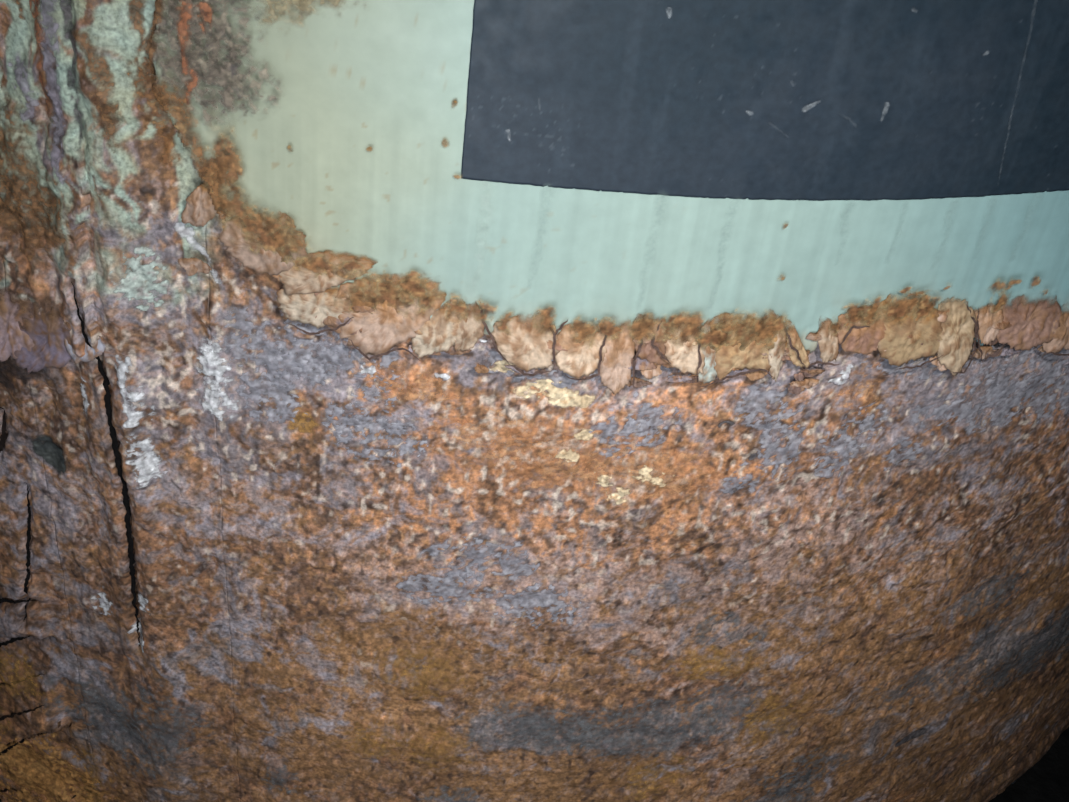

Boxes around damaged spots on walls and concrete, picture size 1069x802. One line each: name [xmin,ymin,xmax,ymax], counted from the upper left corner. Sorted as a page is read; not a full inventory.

rust [0,0,119,267]
rust [127,0,431,315]
rust [446,293,512,334]
rust [535,307,556,333]
peeling [177,185,1069,408]
rust [572,312,788,352]
rust [830,286,951,334]
rust [991,276,1048,313]
peeling [197,338,238,421]
crack [71,282,141,646]
rust [456,415,714,499]
rust [0,727,117,802]